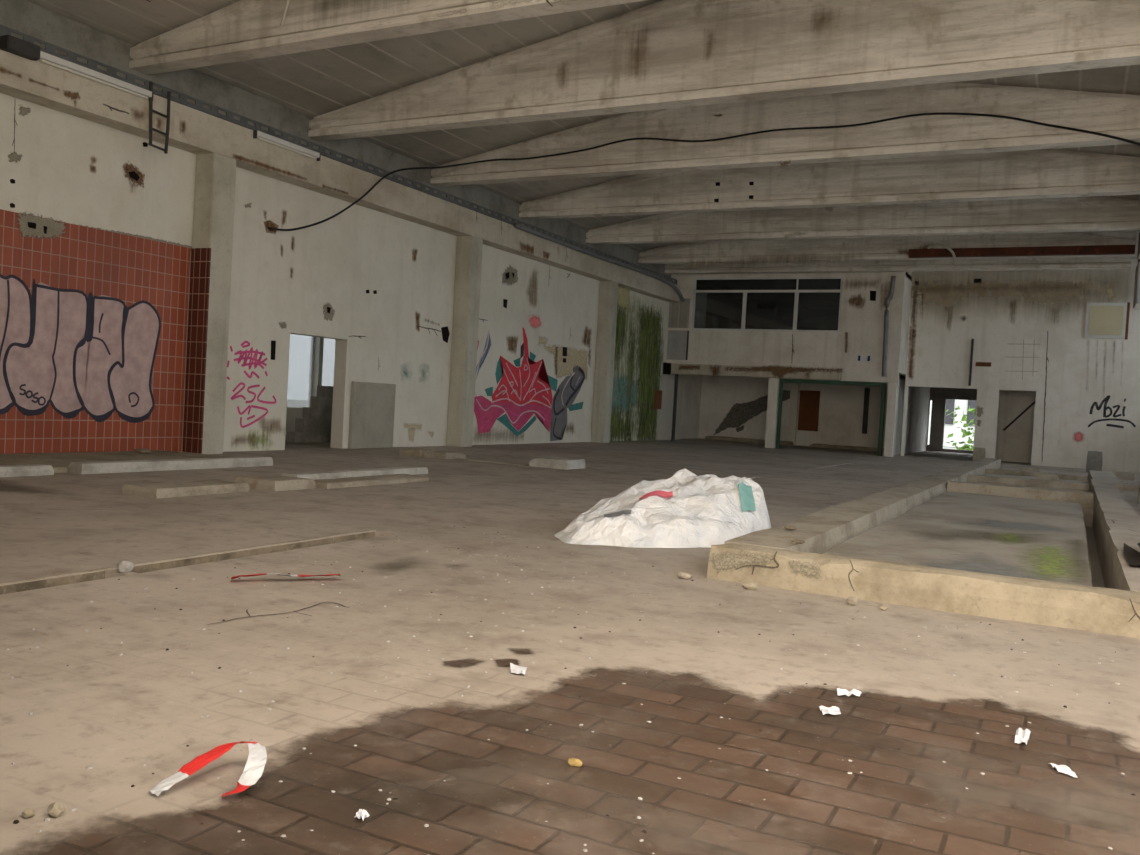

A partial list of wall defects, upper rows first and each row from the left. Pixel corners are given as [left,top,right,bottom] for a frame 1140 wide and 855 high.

flaking render [123,161,145,187]
leakage [610,287,662,441]
leakage [444,648,533,667]
leakage [16,668,1140,855]